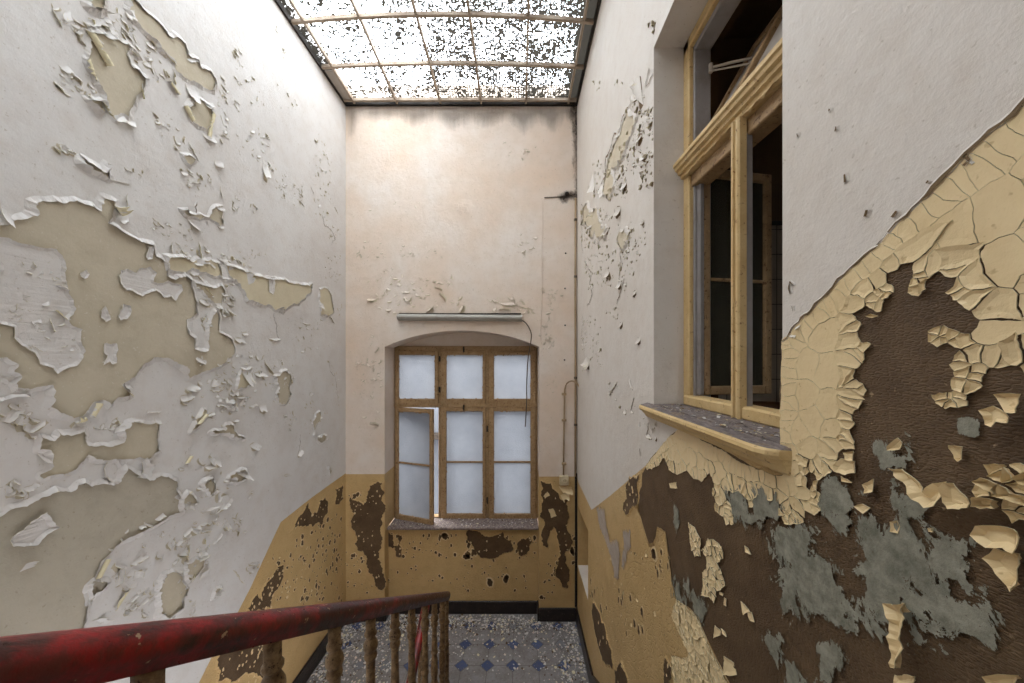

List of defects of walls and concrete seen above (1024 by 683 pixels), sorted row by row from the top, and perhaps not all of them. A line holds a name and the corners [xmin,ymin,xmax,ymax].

peeling [0,0,343,637]
peeling [356,241,466,316]
peeling [580,95,654,253]
peeling [590,103,1024,683]
crack [781,95,1024,342]
peeling [233,480,575,611]